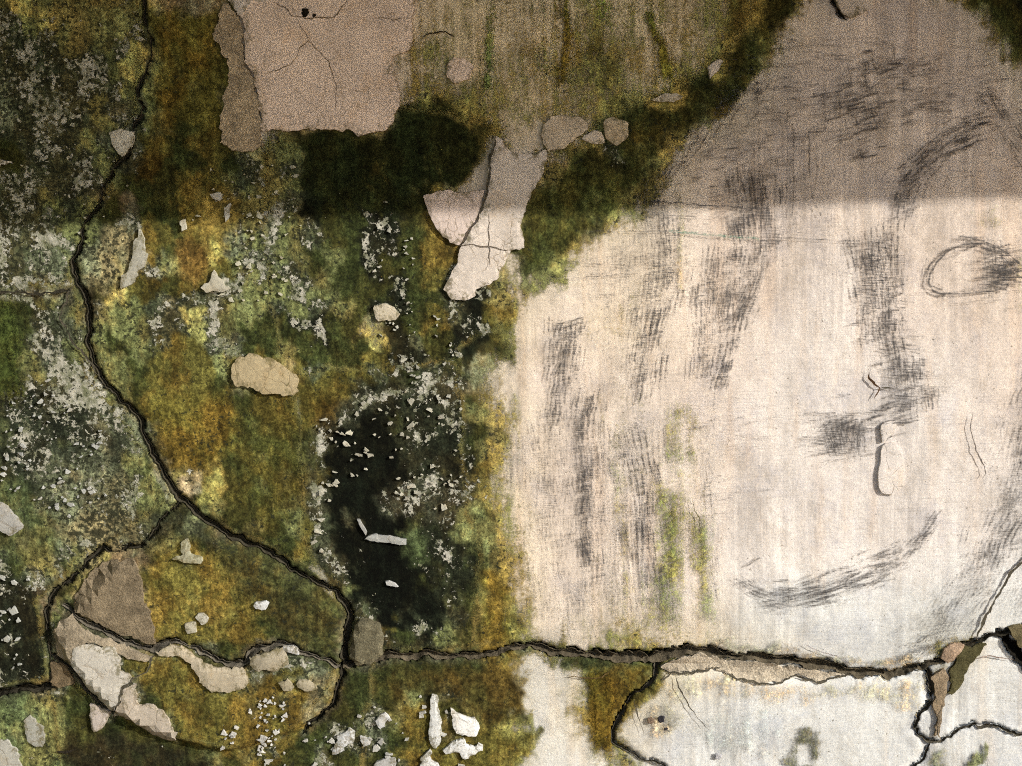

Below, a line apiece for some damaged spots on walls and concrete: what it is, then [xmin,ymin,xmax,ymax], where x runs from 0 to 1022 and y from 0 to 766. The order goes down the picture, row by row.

peeling [212,0,416,152]
crack [460,137,512,262]
peeling [423,115,628,300]
crack [0,148,364,733]
water stain [360,328,792,766]
flaking render [50,558,317,766]
peeling [302,706,409,766]
peeling [419,694,483,766]
crack [374,641,1022,766]
water stain [783,727,821,766]
water stain [699,639,924,709]
crack [961,561,1022,664]